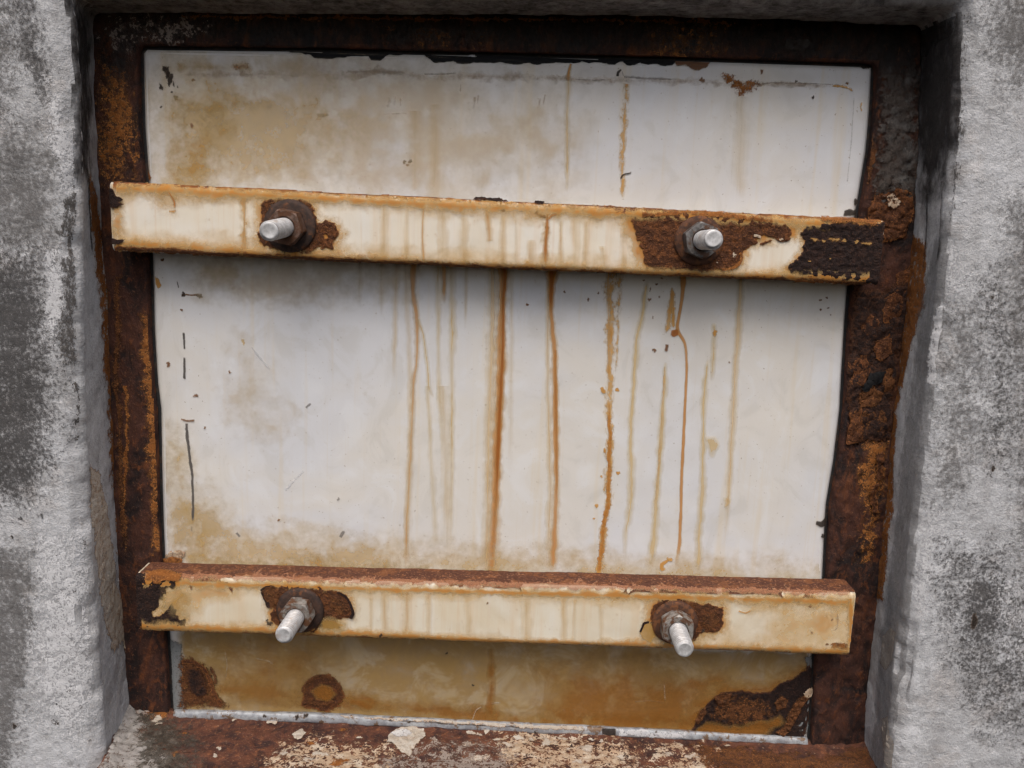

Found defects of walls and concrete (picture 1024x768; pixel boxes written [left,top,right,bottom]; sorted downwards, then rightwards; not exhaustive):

water stain [181,631,808,730]
rust [89,58,927,768]